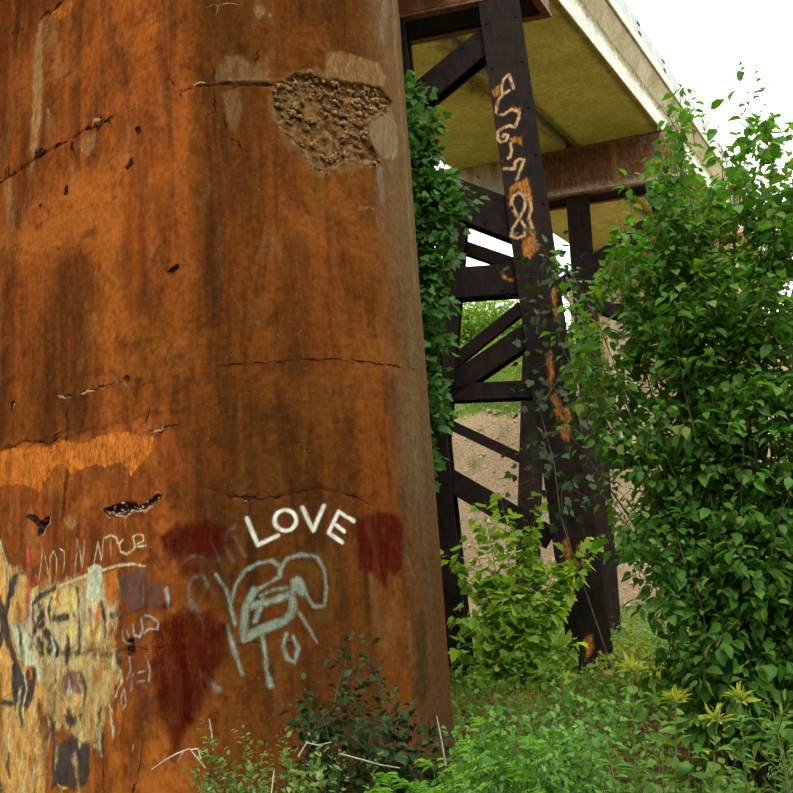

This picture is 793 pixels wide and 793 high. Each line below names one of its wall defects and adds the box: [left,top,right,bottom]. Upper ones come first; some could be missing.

crack [42,0,70,20]
crack [165,47,274,152]
spalling [270,51,398,179]
crack [0,101,148,184]
crack [207,358,416,370]
crack [144,408,182,437]
crack [2,429,105,451]
peeling [0,431,154,495]
spalling [103,492,162,522]
spalling [24,515,51,539]